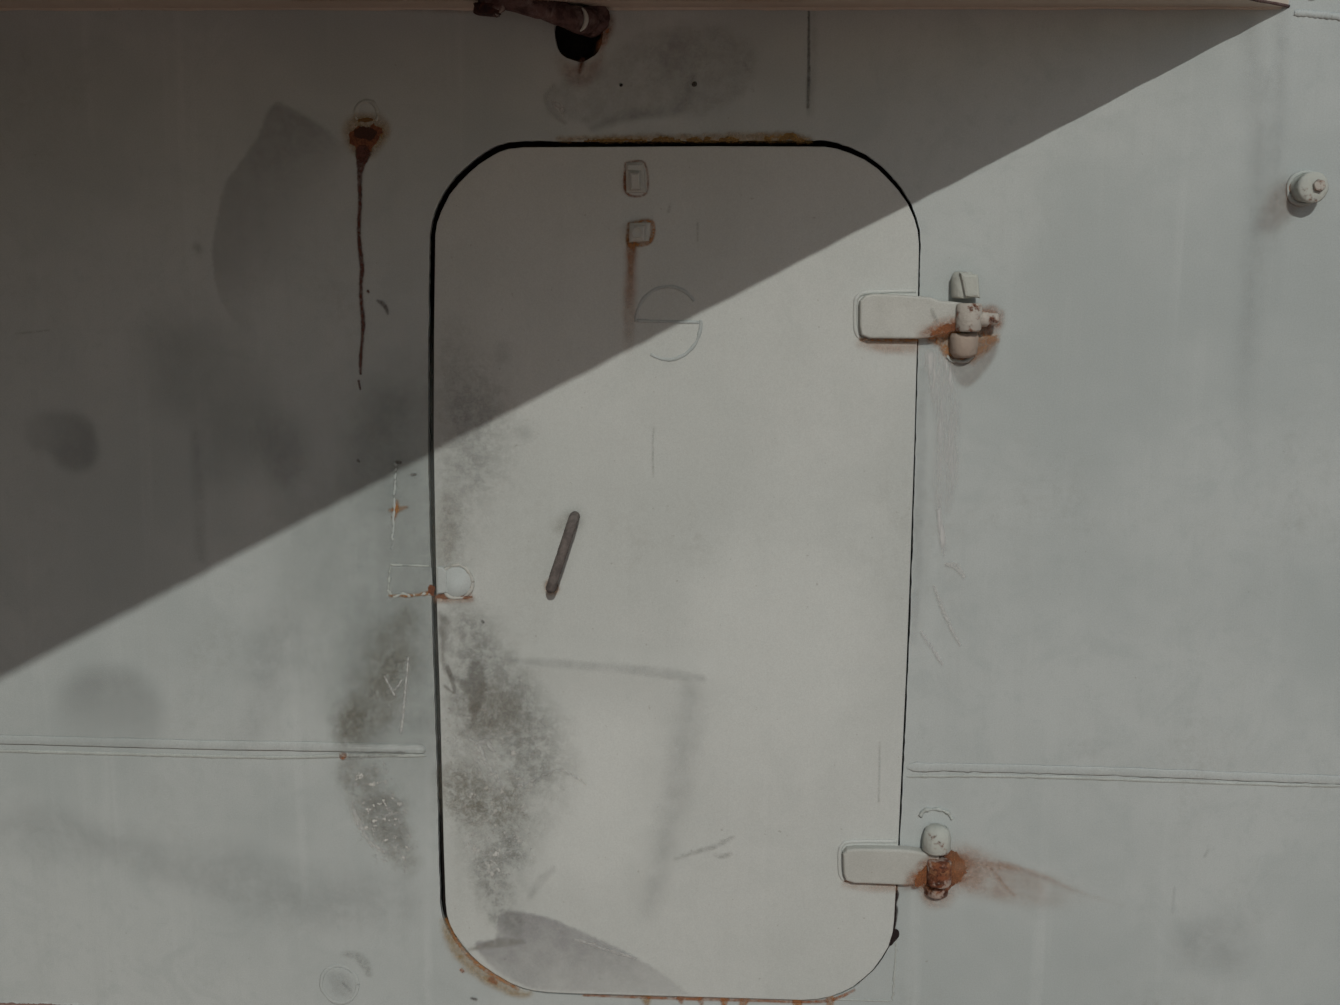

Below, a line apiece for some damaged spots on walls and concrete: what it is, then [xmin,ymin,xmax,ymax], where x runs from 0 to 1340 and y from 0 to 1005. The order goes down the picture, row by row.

rust [565,133,806,143]
rust [349,117,385,390]
rust [626,219,655,272]
rust [863,310,1000,360]
rust [912,865,927,887]
rust [943,850,968,890]
rust [446,919,516,988]
rust [624,889,899,1005]